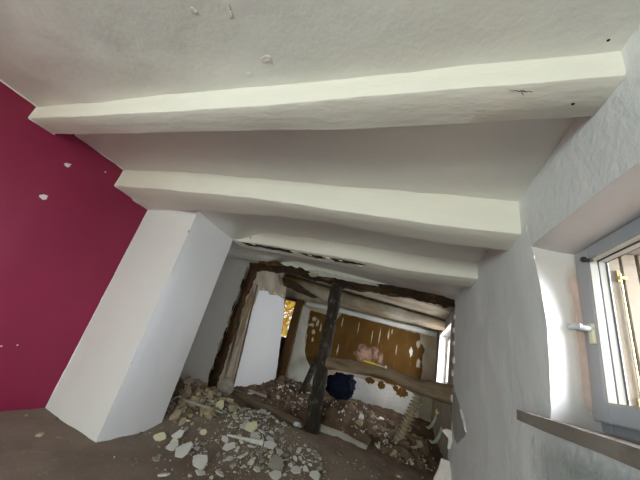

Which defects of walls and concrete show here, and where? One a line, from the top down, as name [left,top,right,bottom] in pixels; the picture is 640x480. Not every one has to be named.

flaking render [282,278,318,298]
flaking render [242,237,364,267]
flaking render [307,270,379,287]
peeling [234,288,284,387]
peeling [287,306,326,386]
peeling [330,314,425,379]
peeling [352,376,420,418]
flaking render [442,384,467,449]